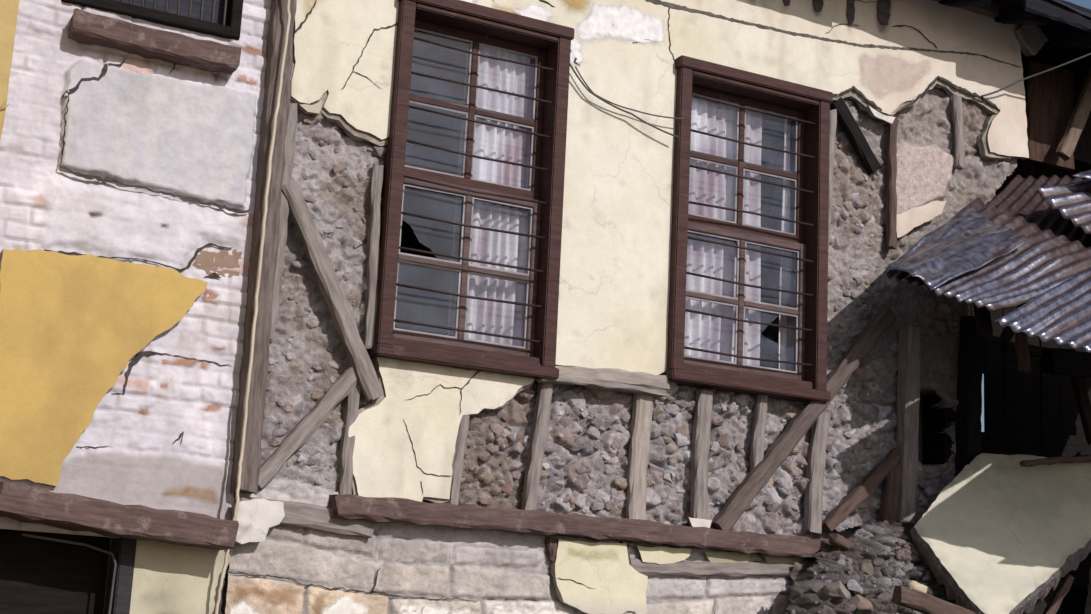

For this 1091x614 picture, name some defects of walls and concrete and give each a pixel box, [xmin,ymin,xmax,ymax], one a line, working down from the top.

crack [633,0,1020,128]
crack [59,58,251,214]
crack [44,243,233,278]
peeling [0,249,242,486]
crack [113,351,231,395]
spalling [822,87,1018,614]
spalling [458,382,539,510]
spalling [646,374,806,529]
damp [230,601,259,614]
damp [322,595,369,614]
damp [399,603,470,614]
peeling [551,538,806,614]